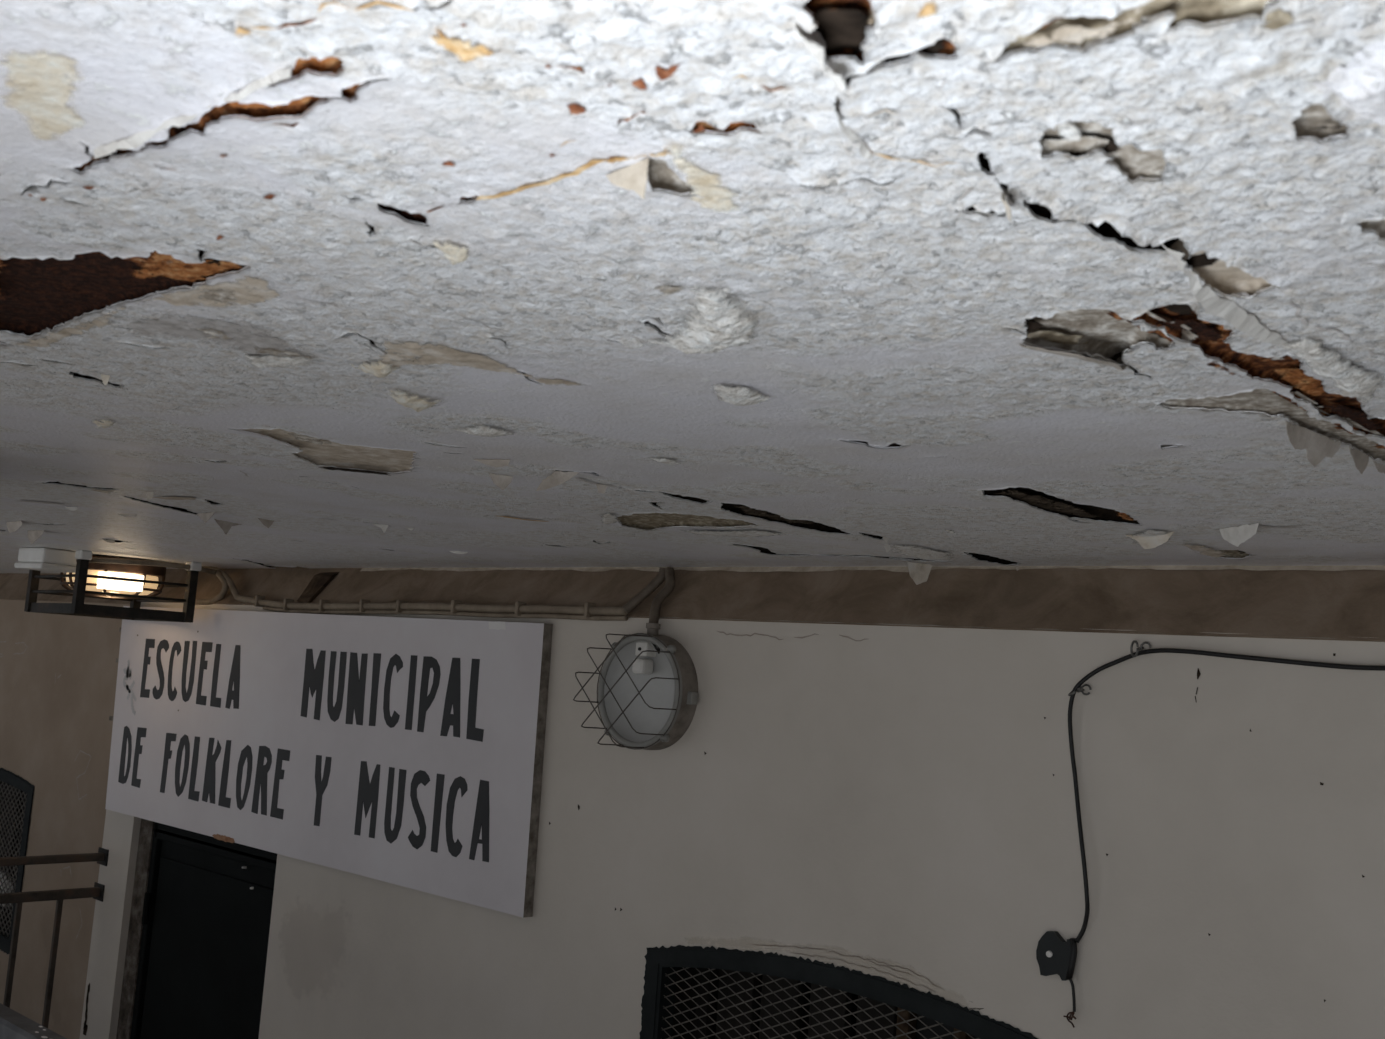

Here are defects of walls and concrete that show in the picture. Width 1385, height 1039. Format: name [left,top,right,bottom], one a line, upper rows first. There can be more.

rust [794,0,956,93]
peeling [1000,0,1293,56]
crack [733,75,795,92]
peeling [606,145,739,212]
crack [836,81,1219,271]
peeling [1040,121,1166,180]
peeling [1293,104,1348,140]
rust [0,250,246,344]
peeling [1168,240,1288,360]
peeling [1019,309,1198,373]
peeling [238,429,416,476]
peeling [1162,389,1385,474]